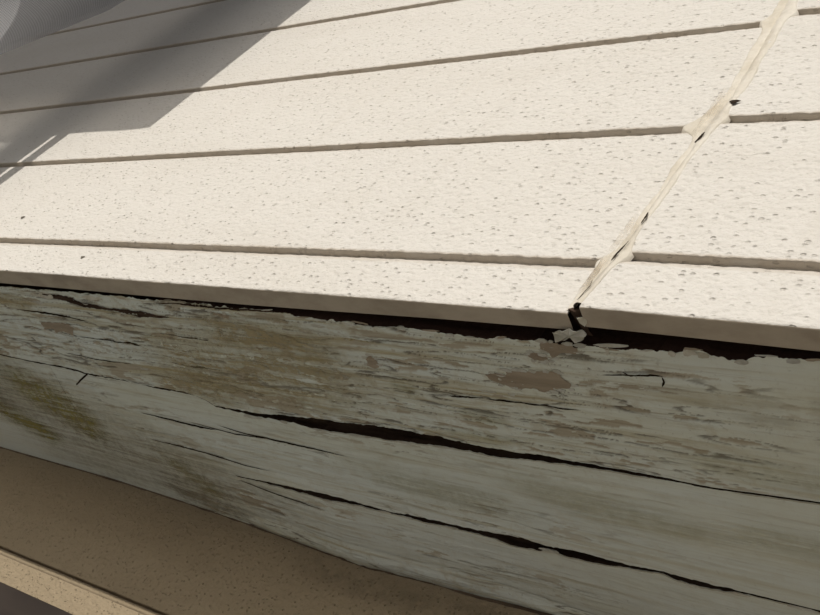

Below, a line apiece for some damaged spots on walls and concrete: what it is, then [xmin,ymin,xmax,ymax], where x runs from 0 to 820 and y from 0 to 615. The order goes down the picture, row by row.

peeling [39,321,74,337]
peeling [478,338,586,394]
peeling [668,350,709,358]
crack [0,292,820,505]
crack [152,439,820,614]